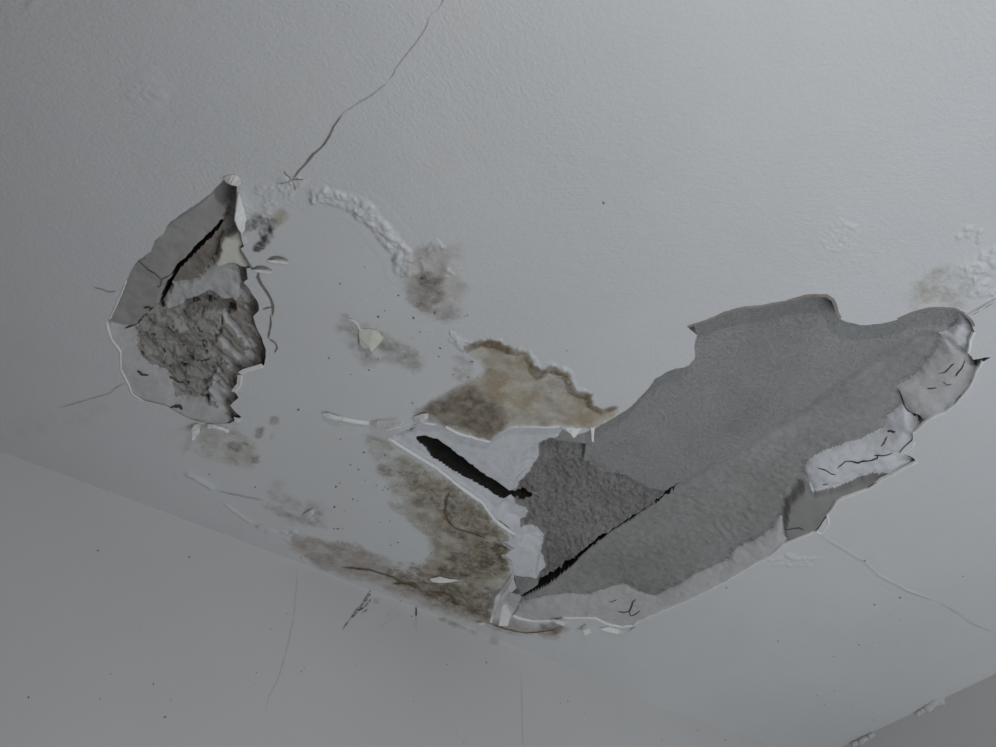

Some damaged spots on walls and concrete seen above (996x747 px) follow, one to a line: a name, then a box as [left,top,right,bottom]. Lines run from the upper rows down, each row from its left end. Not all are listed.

crack [280,0,445,190]
spalling [105,162,464,441]
damp [295,459,562,634]
damp [425,340,616,439]
spalling [322,294,991,635]